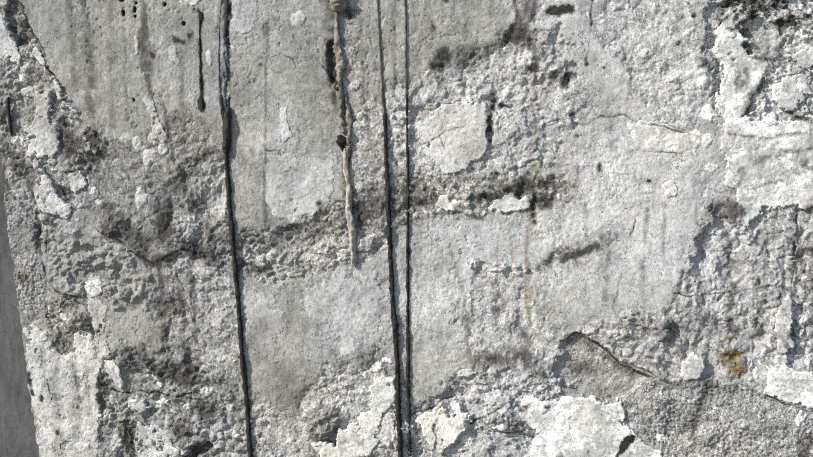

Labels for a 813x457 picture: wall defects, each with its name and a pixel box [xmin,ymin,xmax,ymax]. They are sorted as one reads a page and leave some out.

spalling [0,0,393,457]
water stain [429,47,451,72]
spalling [310,0,688,457]
crack [560,332,644,375]
spalling [516,0,813,457]
water stain [716,0,813,115]